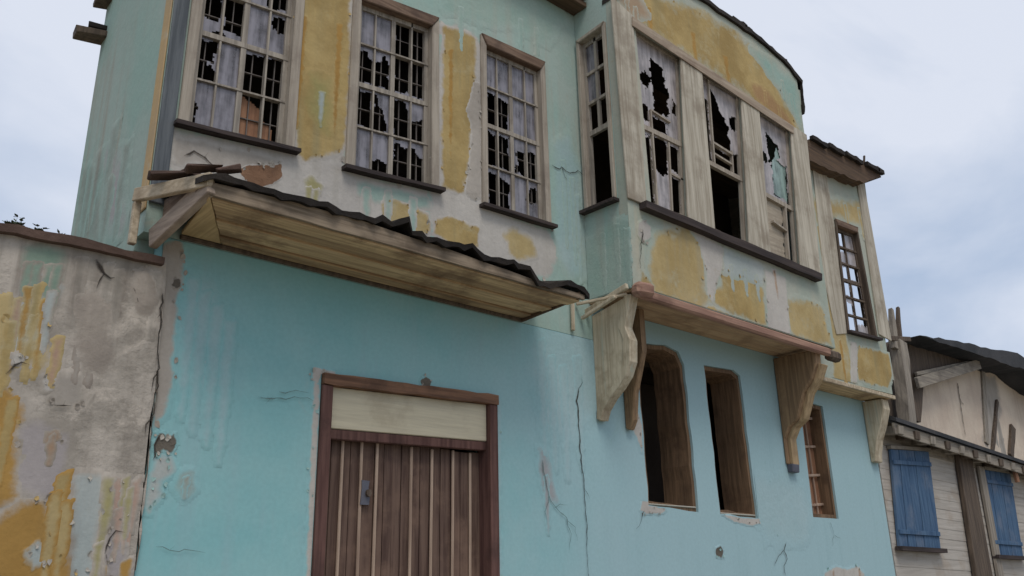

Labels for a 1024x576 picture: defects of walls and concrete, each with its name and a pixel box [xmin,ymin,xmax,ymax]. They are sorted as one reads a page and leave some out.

peeling [169,0,559,281]
peeling [633,0,804,133]
peeling [0,281,181,576]
crack [97,261,114,287]
crack [145,294,164,450]
crack [542,382,589,575]
peeling [636,218,894,392]